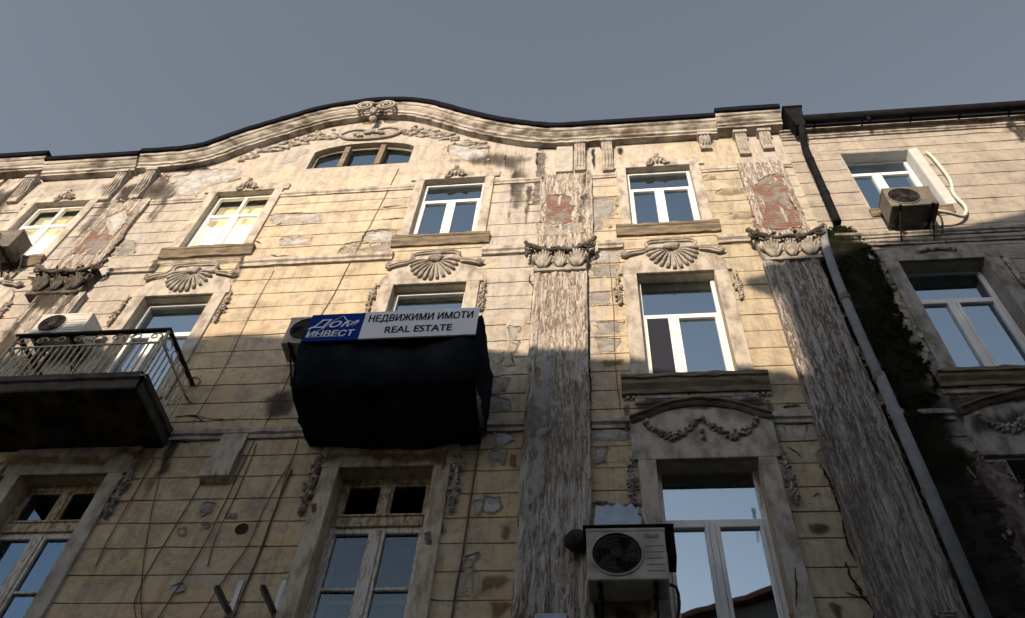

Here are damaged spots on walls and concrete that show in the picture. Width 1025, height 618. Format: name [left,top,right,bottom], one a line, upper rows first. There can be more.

flaking render [70,182,141,258]
flaking render [270,213,323,245]
flaking render [362,230,398,243]
water stain [457,148,557,214]
flaking render [529,152,575,226]
water stain [579,149,595,222]
flaking render [592,196,619,230]
flaking render [746,172,806,230]
flaking render [488,325,522,410]
flaking render [887,419,975,618]
flaking render [937,443,1025,618]